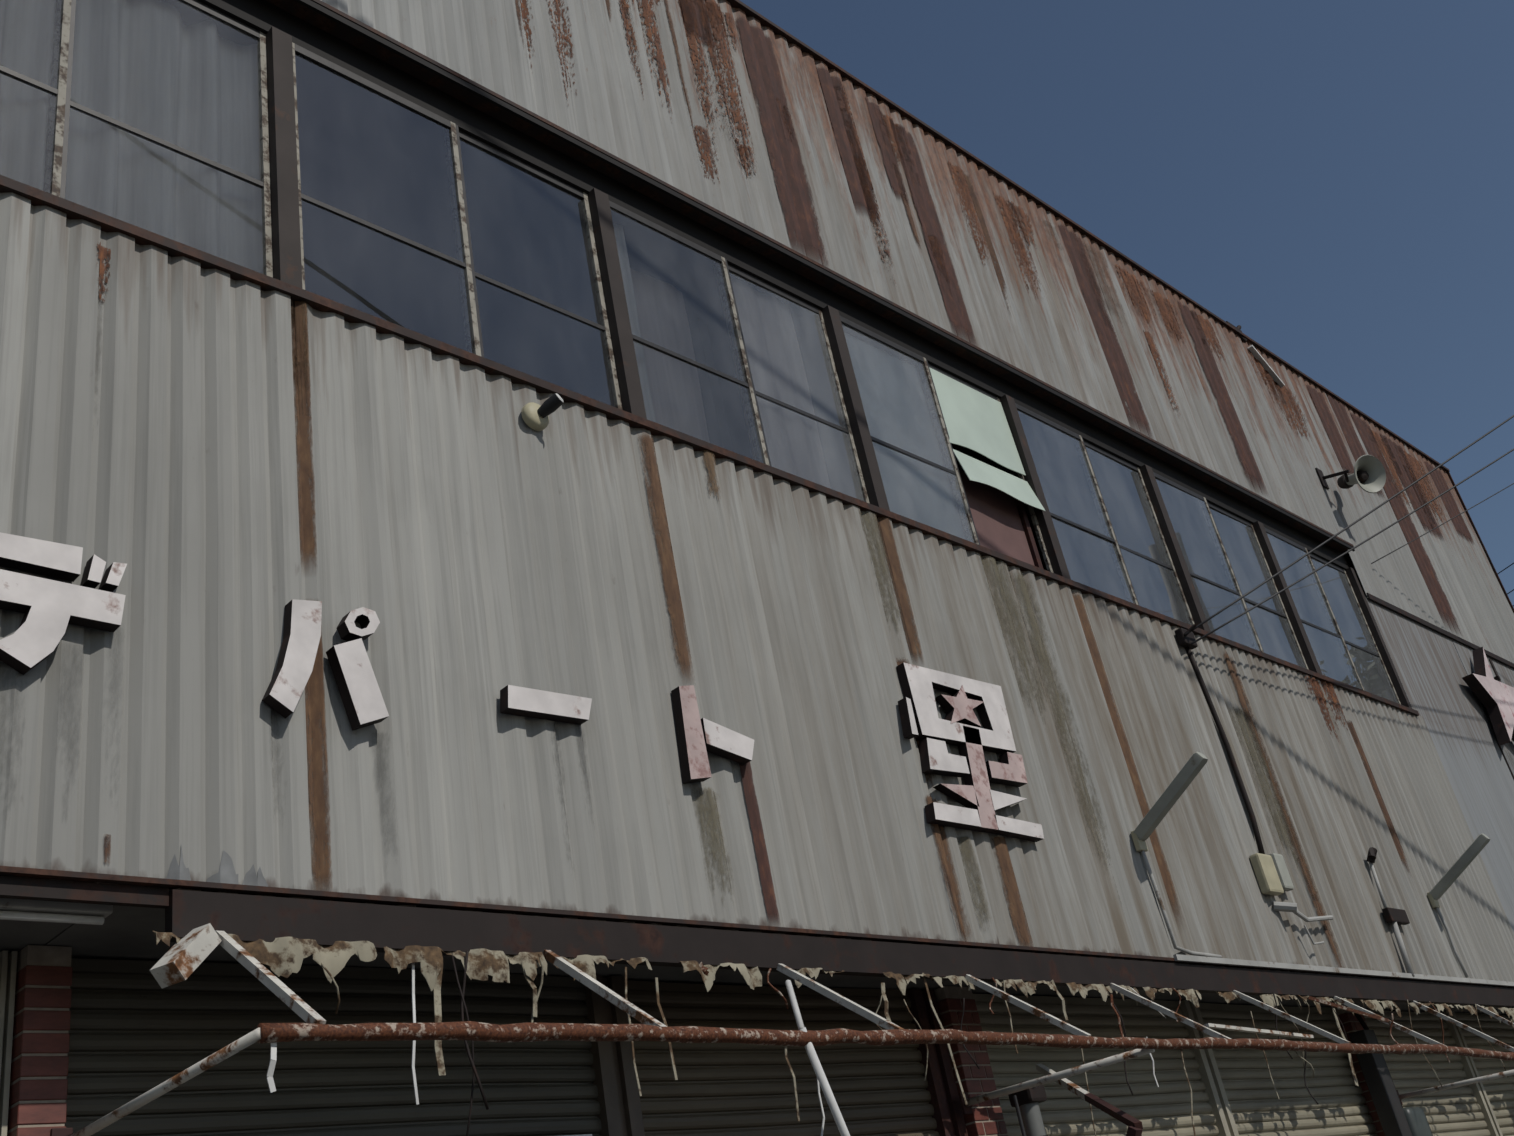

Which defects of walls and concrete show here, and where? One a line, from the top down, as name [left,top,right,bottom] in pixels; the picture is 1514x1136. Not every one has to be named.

rust [291,300,317,562]
rust [515,0,577,107]
rust [641,434,691,674]
rust [702,450,720,501]
rust [605,0,828,264]
rust [816,68,975,340]
rust [948,161,1041,308]
rust [1058,225,1150,432]
rust [1116,264,1266,488]
rust [1248,349,1473,626]
rust [305,636,332,889]
rust [1072,594,1178,912]